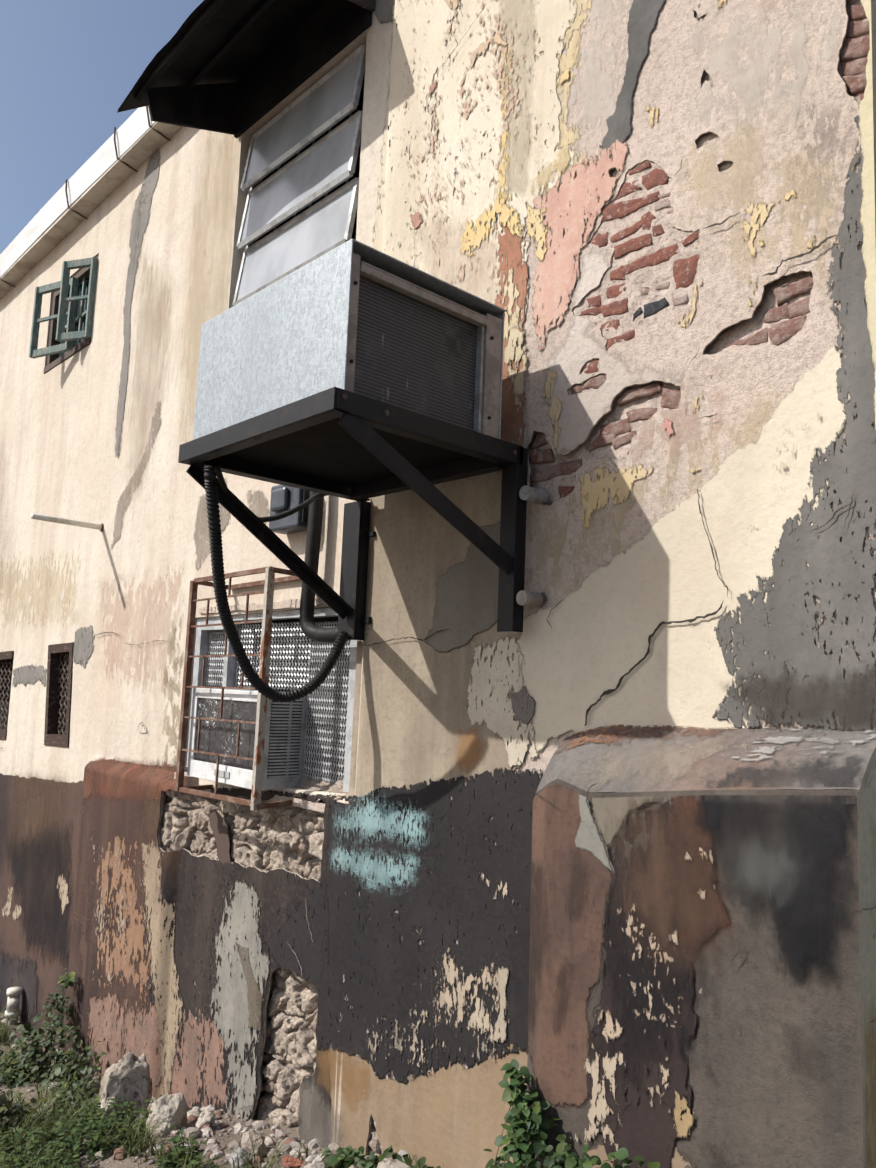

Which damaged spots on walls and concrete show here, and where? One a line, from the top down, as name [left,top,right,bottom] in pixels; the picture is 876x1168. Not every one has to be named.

spalling [838,0,870,102]
spalling [403,0,681,505]
spalling [568,160,702,396]
spalling [704,271,814,355]
crack [584,489,728,726]
peeling [465,636,540,768]
corrosion [83,758,187,802]
spalling [91,781,348,1004]
spalling [255,967,318,1128]
peeling [364,947,509,1075]
peeling [570,1009,630,1151]
peeling [617,904,683,1032]